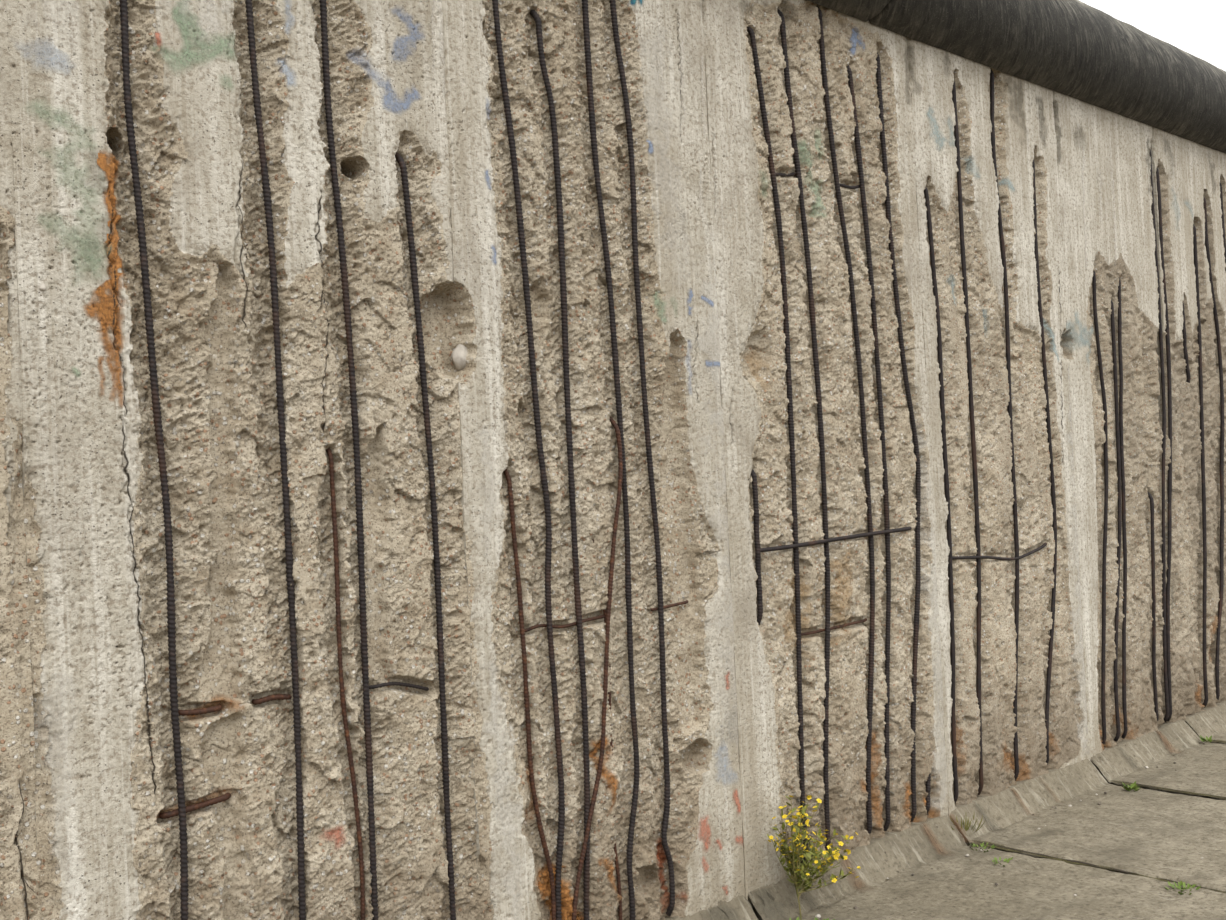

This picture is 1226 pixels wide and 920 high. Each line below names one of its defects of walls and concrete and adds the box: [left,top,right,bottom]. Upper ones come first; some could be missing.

spalling [0,205,64,920]
rust [86,152,124,404]
spalling [130,465,169,920]
spalling [184,244,284,920]
spalling [284,258,360,920]
spalling [358,206,477,920]
spalling [486,56,534,818]
rust [538,865,584,920]
spalling [511,0,619,920]
rust [589,739,618,798]
spalling [739,0,937,864]
spalling [931,179,1226,804]